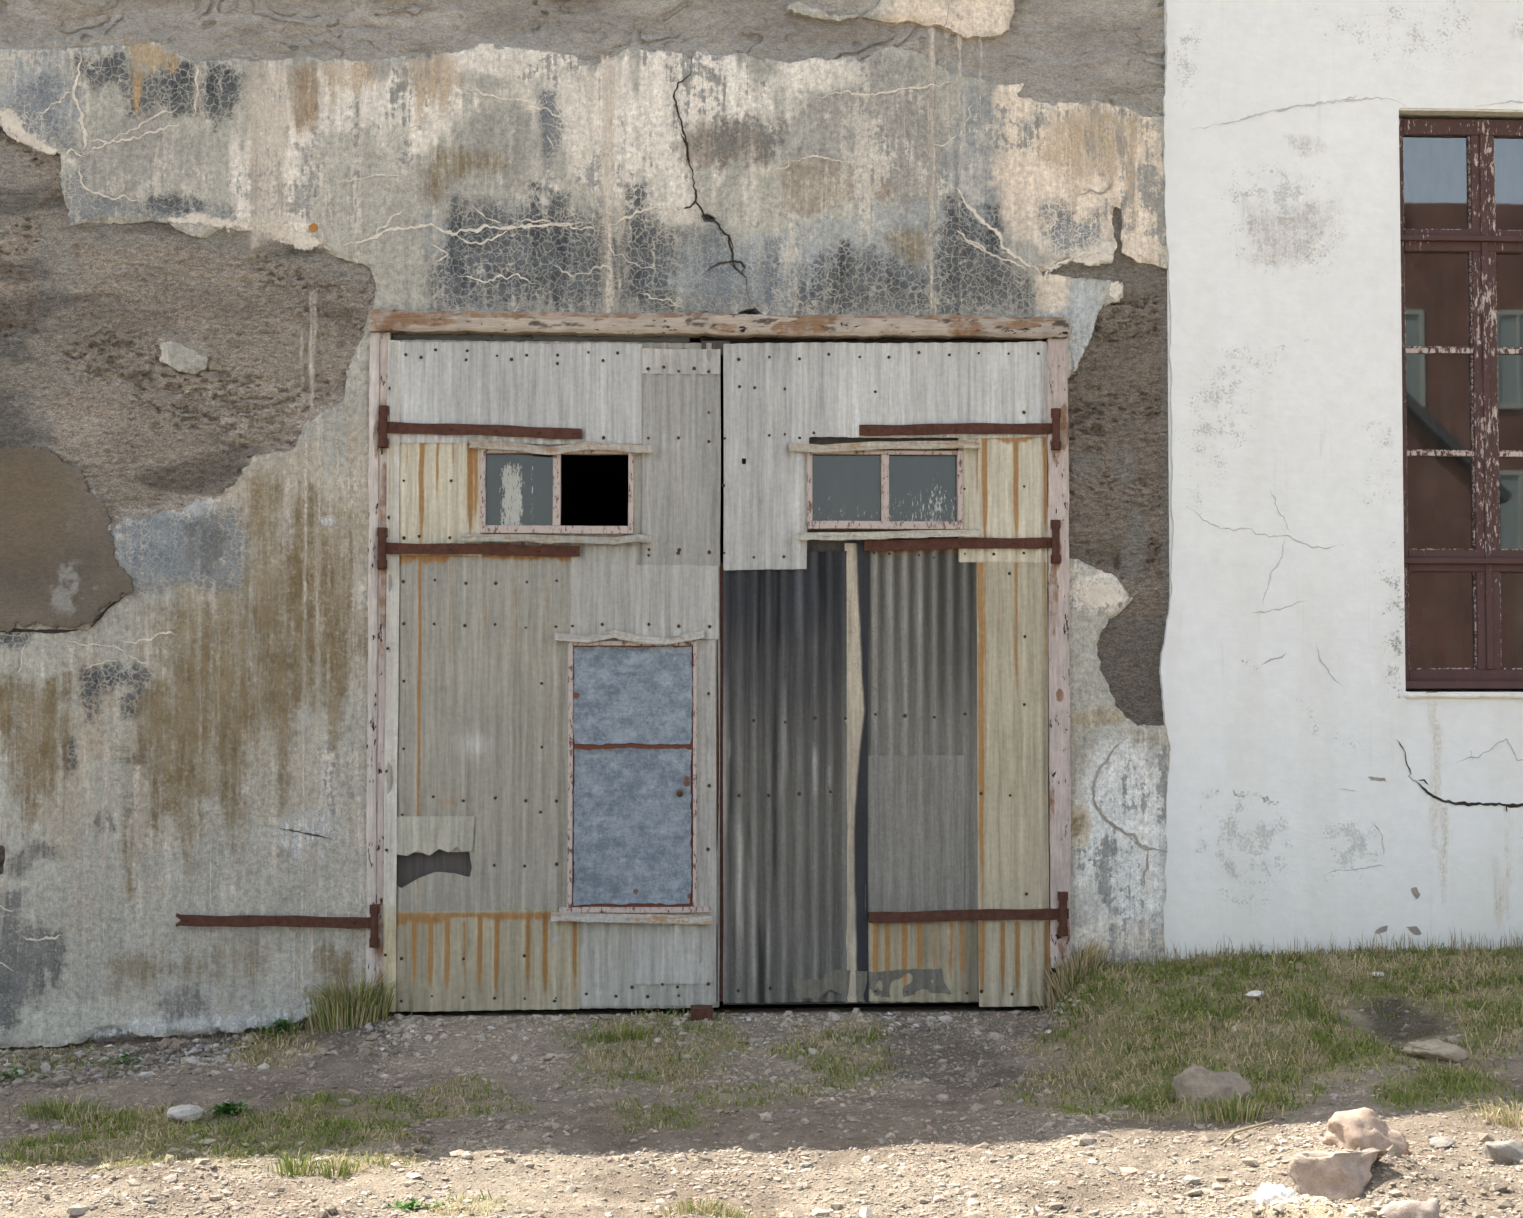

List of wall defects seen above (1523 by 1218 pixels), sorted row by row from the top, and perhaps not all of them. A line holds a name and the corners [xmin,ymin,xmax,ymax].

spalling [0,0,1165,117]
crack [673,52,755,308]
spalling [0,126,378,531]
spalling [1042,207,1170,726]
crack [1186,493,1338,613]
leakage [0,441,356,1036]
crack [1091,738,1167,889]
crack [1262,648,1342,686]
crack [1398,738,1523,838]